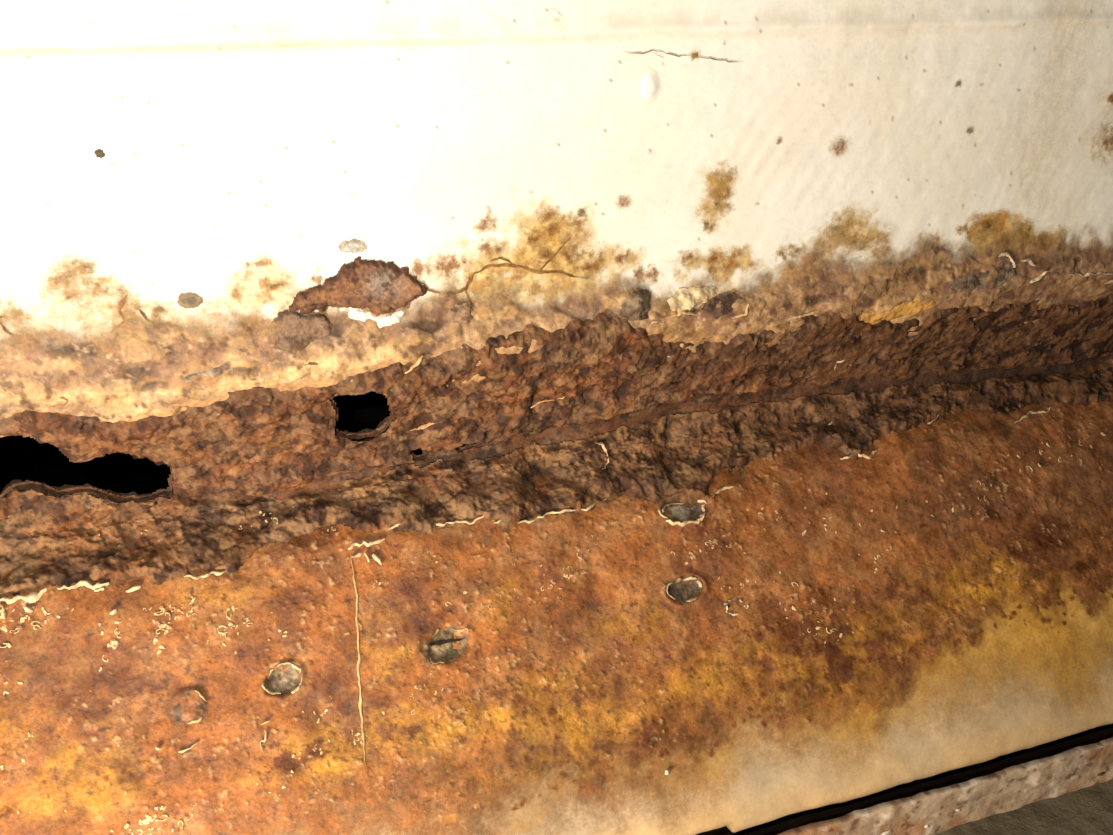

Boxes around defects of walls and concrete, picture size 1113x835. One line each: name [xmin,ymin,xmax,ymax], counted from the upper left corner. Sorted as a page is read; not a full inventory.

corrosion [699,168,737,232]
peeling [338,238,367,253]
crack [418,237,588,304]
peeling [950,252,1050,292]
corrosion [0,202,1113,423]
spalling [0,272,1113,672]
corrosion [0,398,1113,835]
spalling [262,661,303,695]